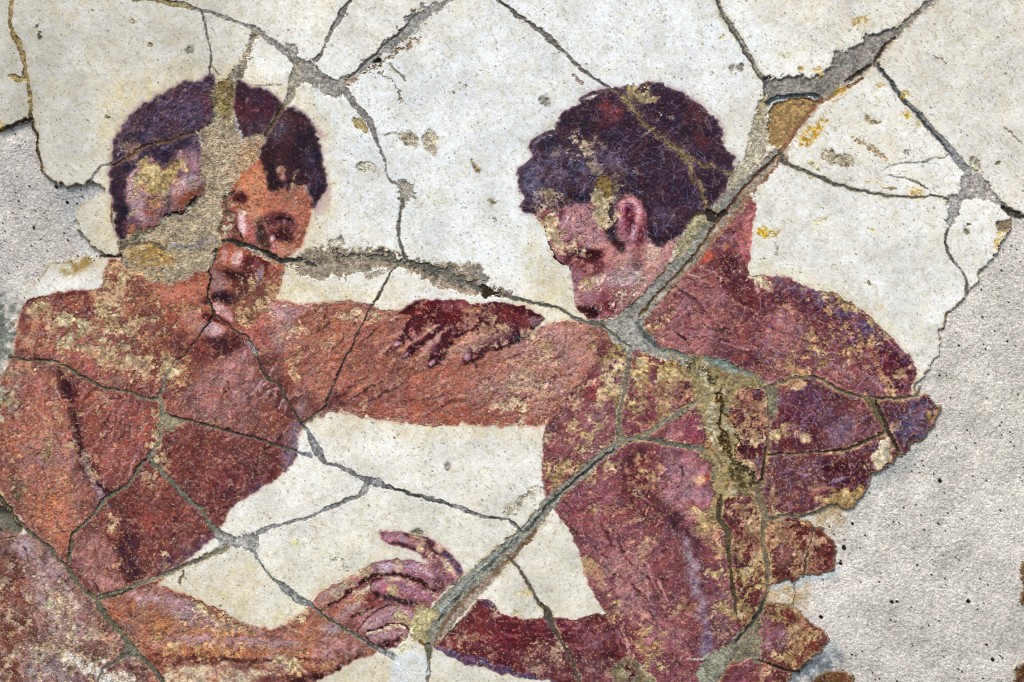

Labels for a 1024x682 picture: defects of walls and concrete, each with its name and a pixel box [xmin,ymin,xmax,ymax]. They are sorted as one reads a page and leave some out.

crack [0,0,44,173]
spalling [16,31,266,391]
crack [89,131,196,184]
crack [131,0,455,264]
crack [496,0,1024,452]
crack [0,248,622,682]
crack [687,357,921,682]
peeling [815,485,866,510]
peeling [818,291,891,340]
peeling [871,435,895,469]
peeling [867,356,911,398]
peeling [766,620,822,671]